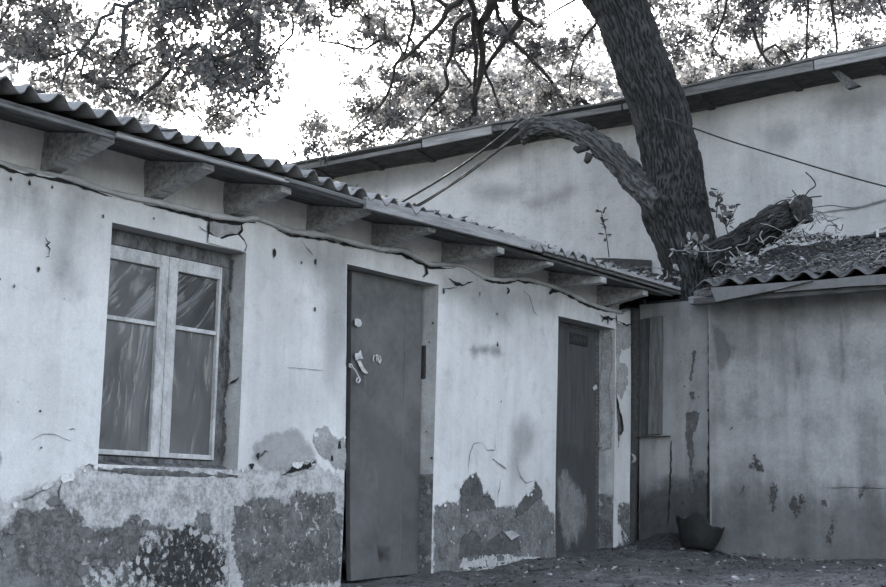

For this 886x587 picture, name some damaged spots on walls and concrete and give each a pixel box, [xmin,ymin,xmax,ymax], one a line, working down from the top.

crack [0,164,112,197]
crack [145,204,256,251]
crack [278,230,363,255]
crack [387,253,631,326]
flaking render [0,308,346,587]
crack [468,443,534,503]
peeling [685,392,704,497]
peeling [433,473,556,573]